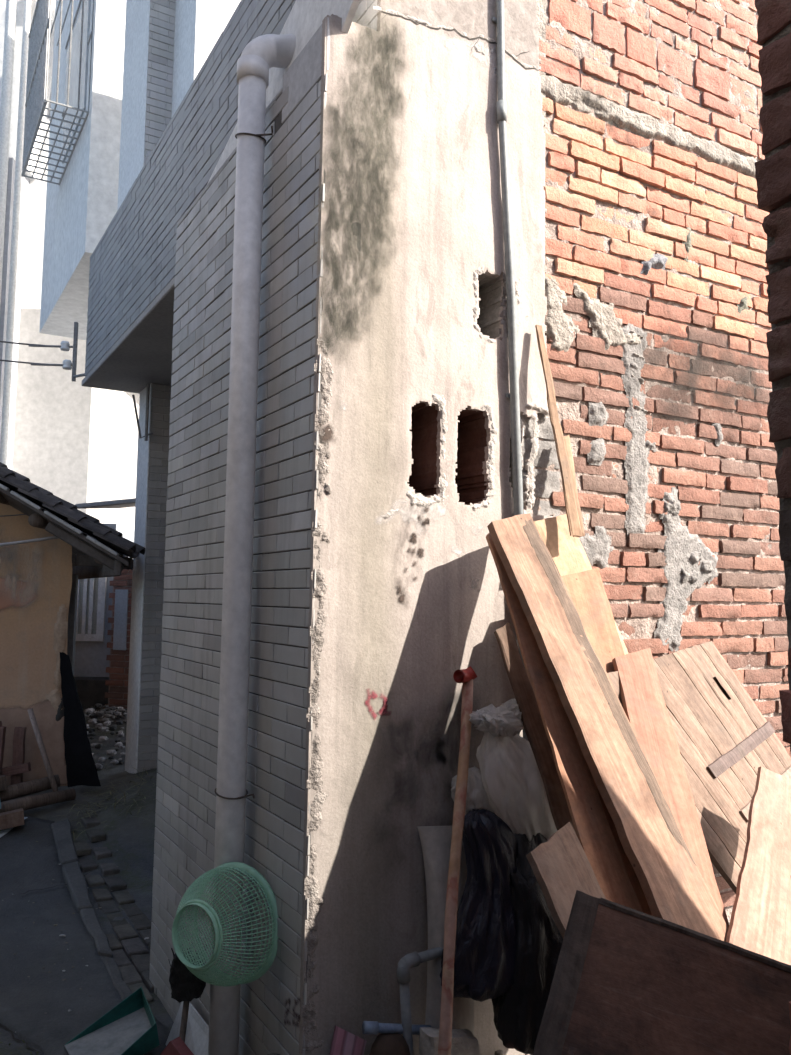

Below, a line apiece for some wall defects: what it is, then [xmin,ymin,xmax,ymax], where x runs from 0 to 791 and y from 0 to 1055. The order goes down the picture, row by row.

crack [373,5,541,70]
damp [327,27,402,346]
spalling [472,265,522,343]
peeling [627,330,645,384]
peeling [659,499,681,519]
peeling [681,551,714,585]
spalling [300,335,346,1054]